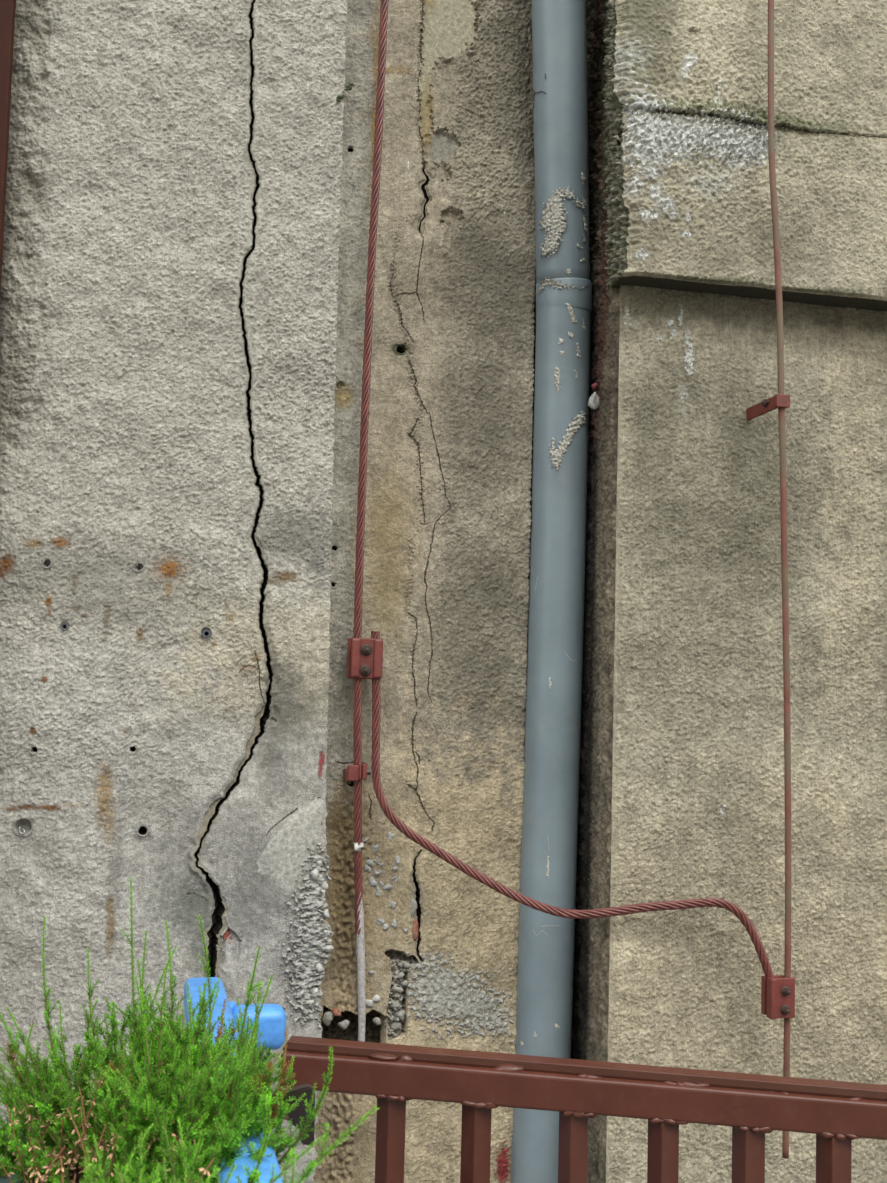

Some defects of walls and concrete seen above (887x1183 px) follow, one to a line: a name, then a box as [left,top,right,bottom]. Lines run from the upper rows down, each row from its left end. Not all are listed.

crack [390,1,433,322]
damp [597,1,782,237]
corrosion [0,554,14,578]
corrosion [160,561,178,592]
crack [187,0,277,977]
corrosion [267,571,296,583]
crack [406,412,458,962]
flaking render [383,949,416,1040]